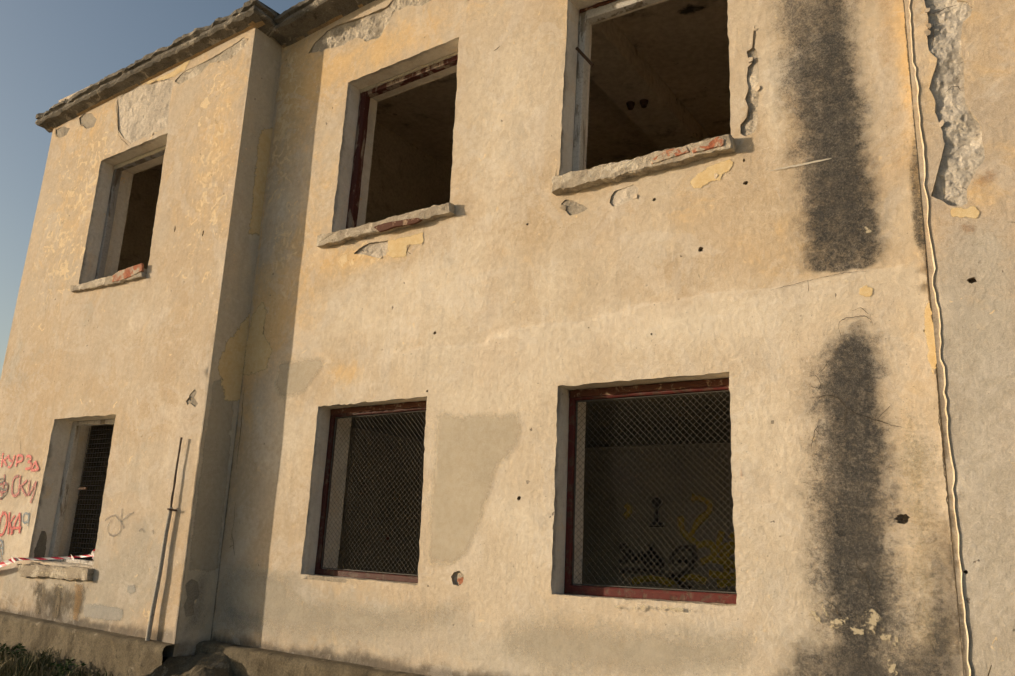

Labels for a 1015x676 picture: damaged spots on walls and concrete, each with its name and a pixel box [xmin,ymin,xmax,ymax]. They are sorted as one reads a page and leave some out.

flaking render [309,0,431,53]
flaking render [116,38,248,143]
flaking render [650,136,725,164]
peeling [691,159,733,188]
flaking render [740,27,760,136]
water stain [781,0,881,272]
crack [903,0,956,322]
flaking render [924,0,985,219]
peeling [354,232,424,258]
peeling [218,314,250,401]
water stain [787,326,950,676]
crack [935,351,964,674]